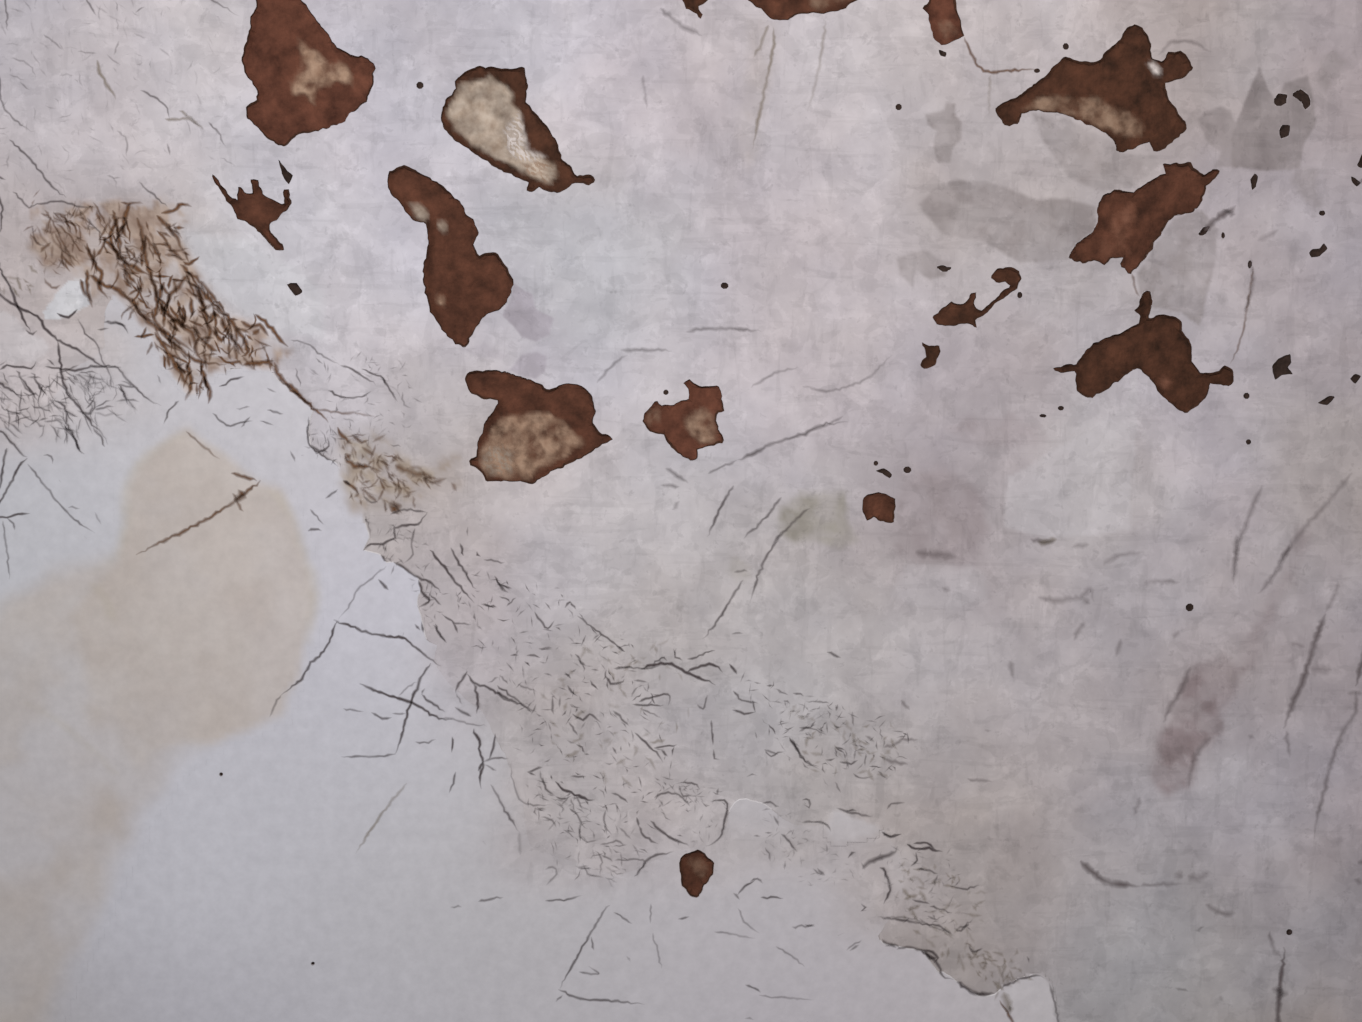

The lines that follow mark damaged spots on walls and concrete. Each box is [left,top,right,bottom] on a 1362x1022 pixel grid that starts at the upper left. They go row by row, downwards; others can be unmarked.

crack [13,143,70,225]
peeling [42,280,89,320]
crack [0,269,176,518]
corrosion [22,191,312,407]
crack [157,473,257,544]
spalling [287,283,302,296]
crack [283,367,393,496]
water stain [0,419,328,1022]
peeling [0,300,1060,1022]
crack [291,510,895,872]
crack [566,938,612,1002]
crack [849,833,1036,1022]